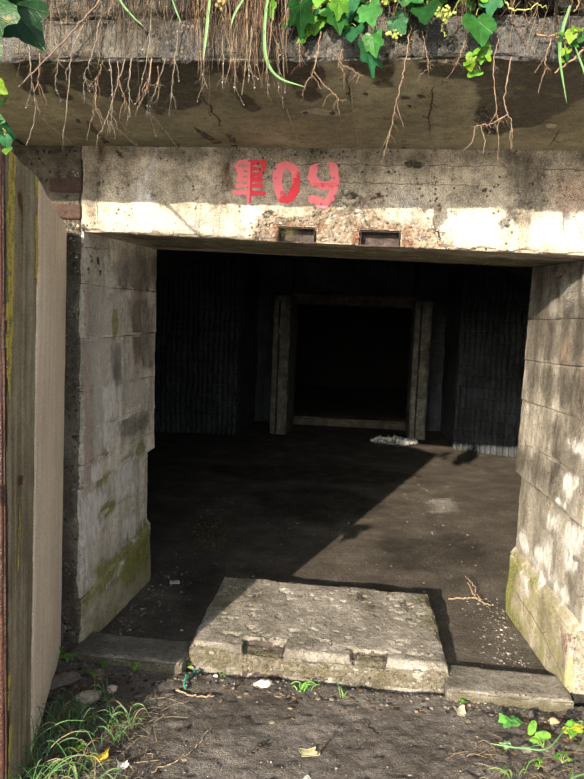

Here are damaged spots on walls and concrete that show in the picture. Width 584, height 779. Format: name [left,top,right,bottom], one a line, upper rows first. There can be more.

water stain [13,0,325,115]
water stain [349,3,420,87]
crack [423,87,437,136]
water stain [417,57,584,136]
water stain [79,454,141,589]
efflorescence [546,474,584,573]
efflorescence [519,532,569,604]